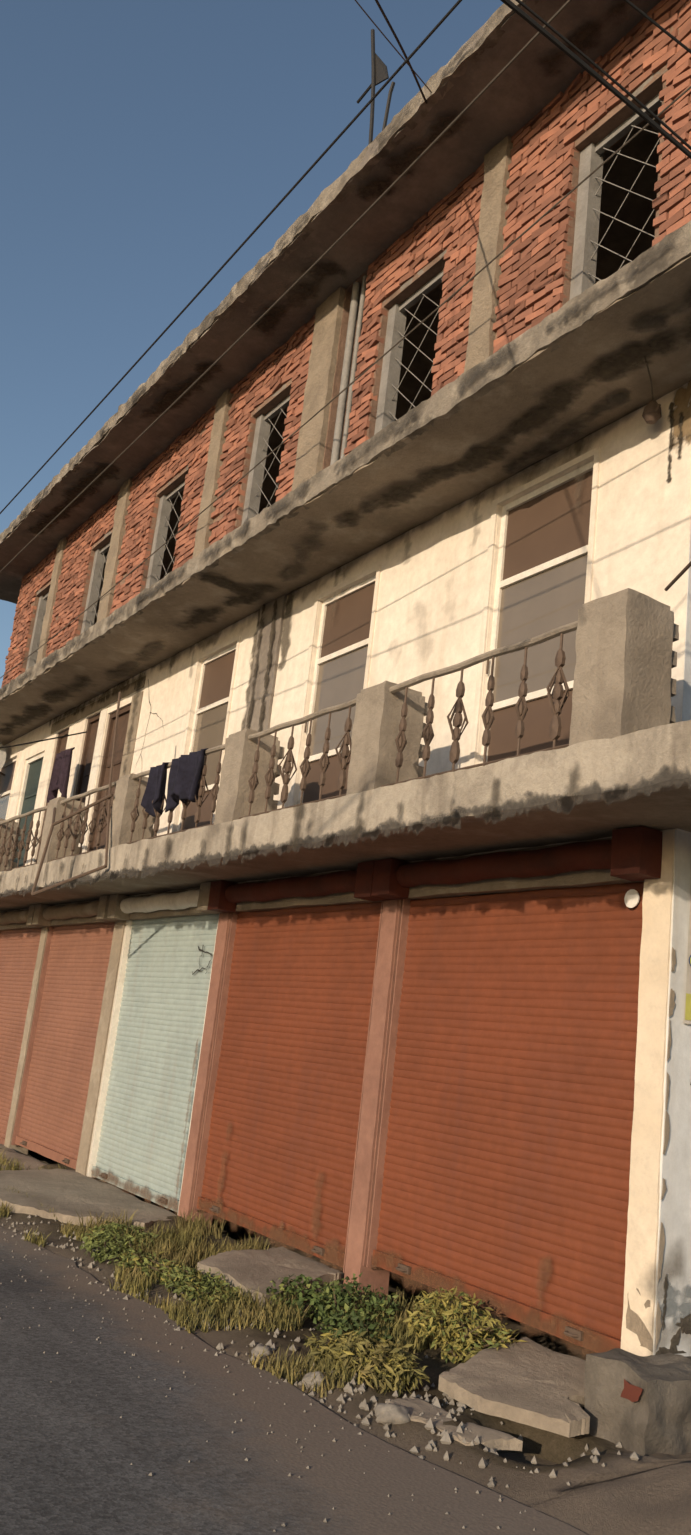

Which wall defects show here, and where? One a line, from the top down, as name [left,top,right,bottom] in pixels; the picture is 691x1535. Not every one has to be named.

leakage [358,117,466,201]
leakage [253,263,343,333]
leakage [0,290,691,771]
flaking render [663,947,676,1155]
flaking render [657,1222,665,1282]
flaking render [626,1288,691,1355]
leakage [662,1260,678,1330]